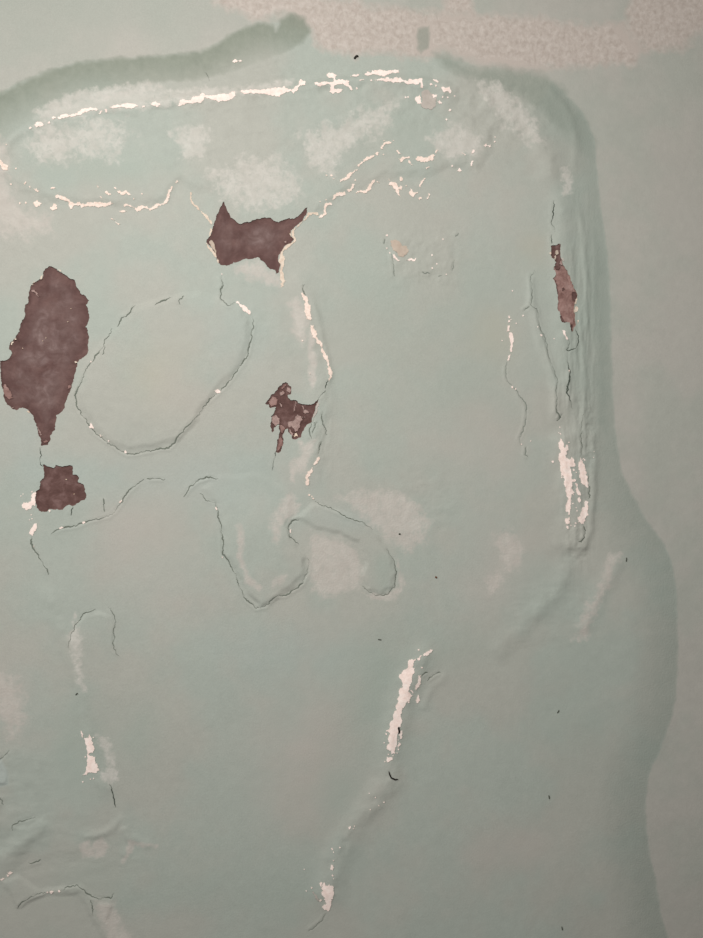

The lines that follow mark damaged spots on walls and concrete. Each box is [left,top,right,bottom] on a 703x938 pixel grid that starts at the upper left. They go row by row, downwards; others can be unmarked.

peeling [178,69,455,121]
water stain [0,0,703,252]
peeling [190,140,437,287]
peeling [0,266,89,446]
water stain [228,258,319,394]
peeling [265,382,319,453]
crack [505,363,531,457]
peeling [22,464,86,520]
water stain [231,431,440,606]
water stain [521,78,682,938]
water stain [91,729,125,792]
peeling [384,649,433,762]